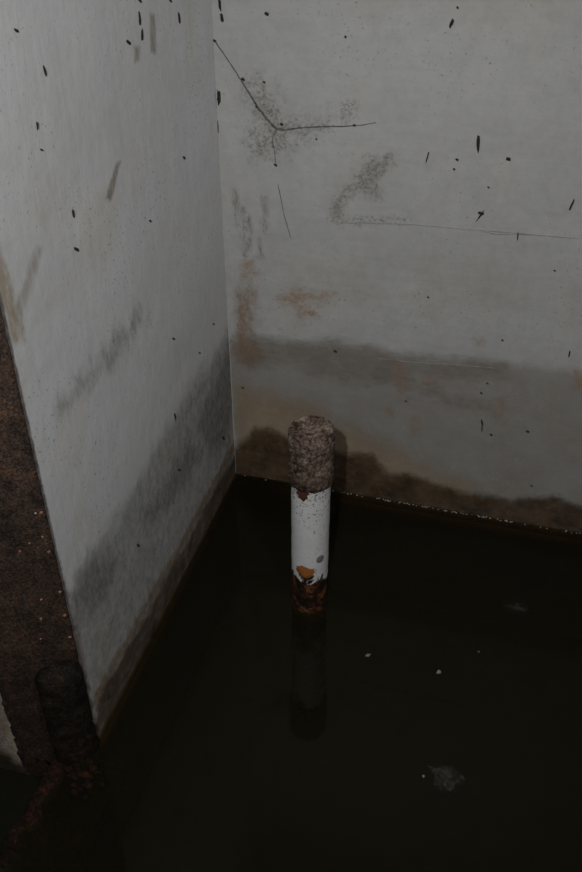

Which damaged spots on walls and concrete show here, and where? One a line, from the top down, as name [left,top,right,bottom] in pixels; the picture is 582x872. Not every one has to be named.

crack [215,42,376,164]
rust [296,566,315,578]
leakage [78,340,582,738]